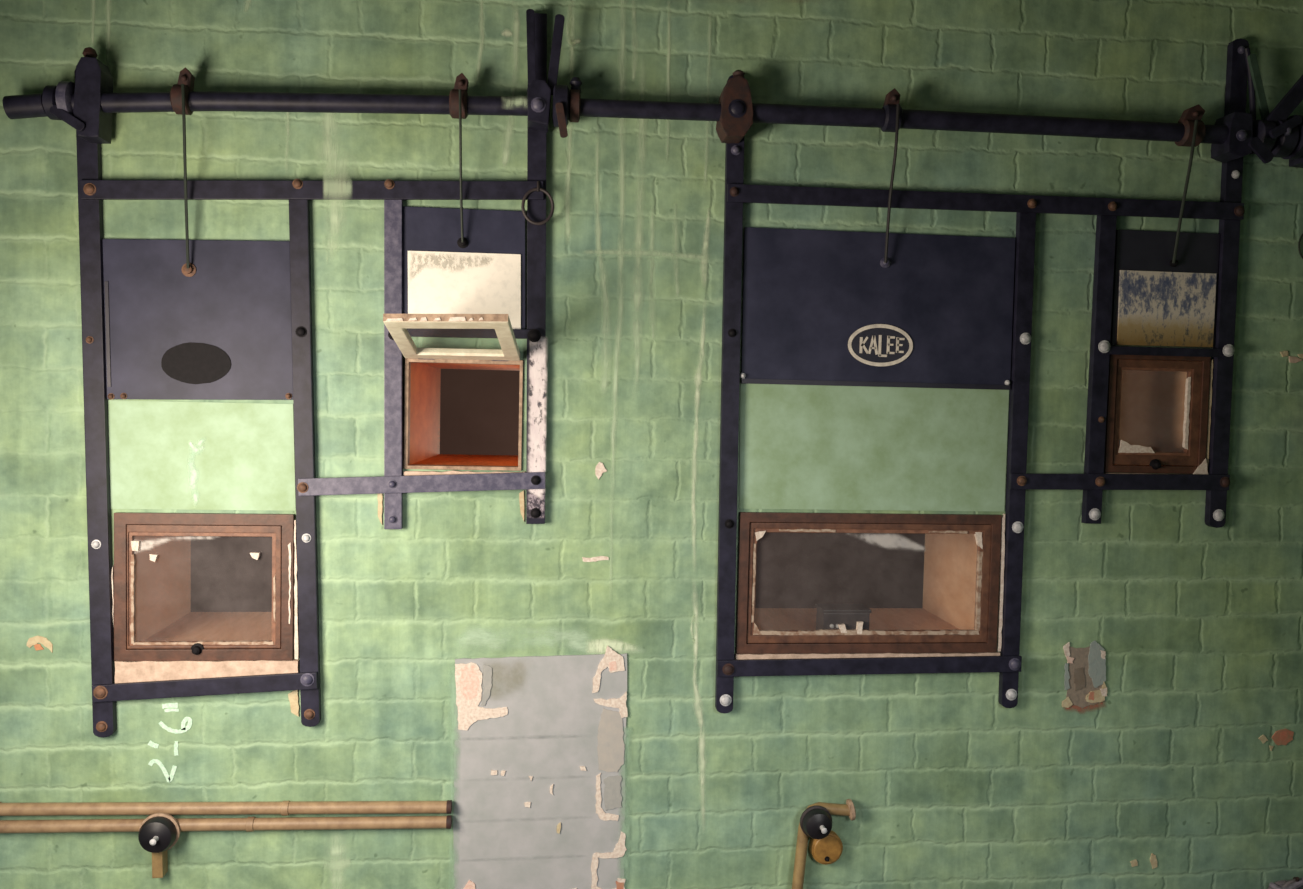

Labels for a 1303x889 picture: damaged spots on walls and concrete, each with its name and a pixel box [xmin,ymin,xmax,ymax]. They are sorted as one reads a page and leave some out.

peeling [455,662,508,730]
flaking render [1062,640,1107,711]
peeling [575,645,628,889]